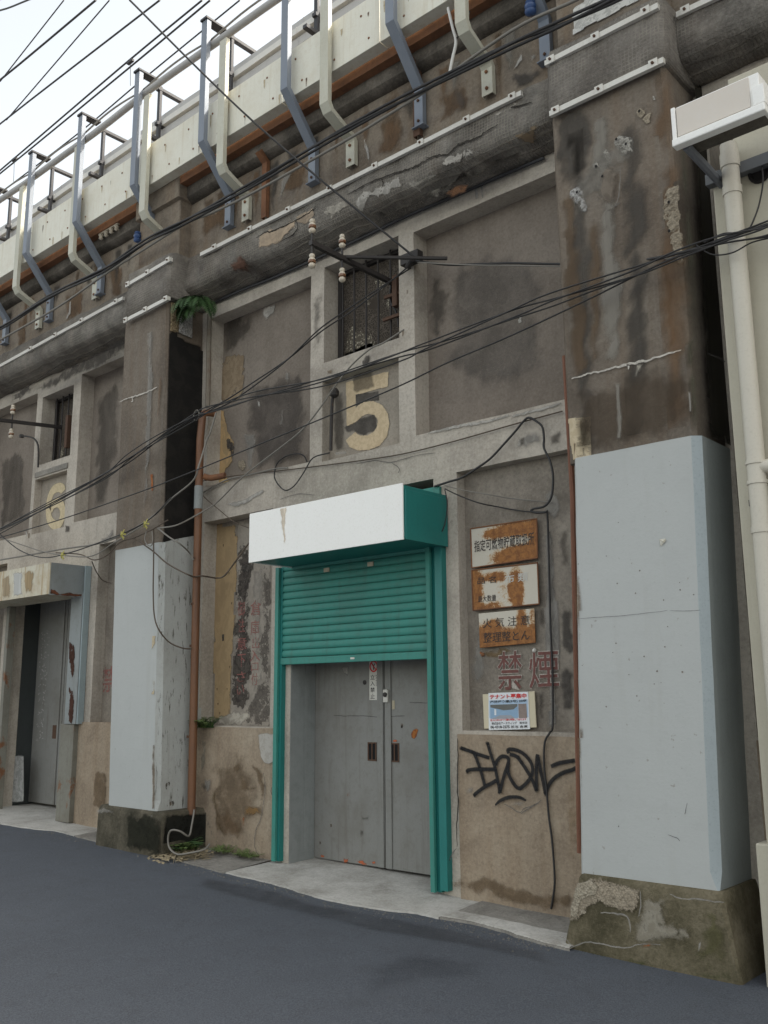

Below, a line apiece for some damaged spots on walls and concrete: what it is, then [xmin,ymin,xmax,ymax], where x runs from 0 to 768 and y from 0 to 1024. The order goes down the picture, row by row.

peeling [443,148,477,165]
spalling [592,135,633,178]
peeling [259,173,452,247]
spalling [570,187,587,212]
spalling [662,185,683,264]
damp [557,112,731,447]
damp [202,749,264,833]
damp [454,878,570,907]
spalling [569,877,640,921]